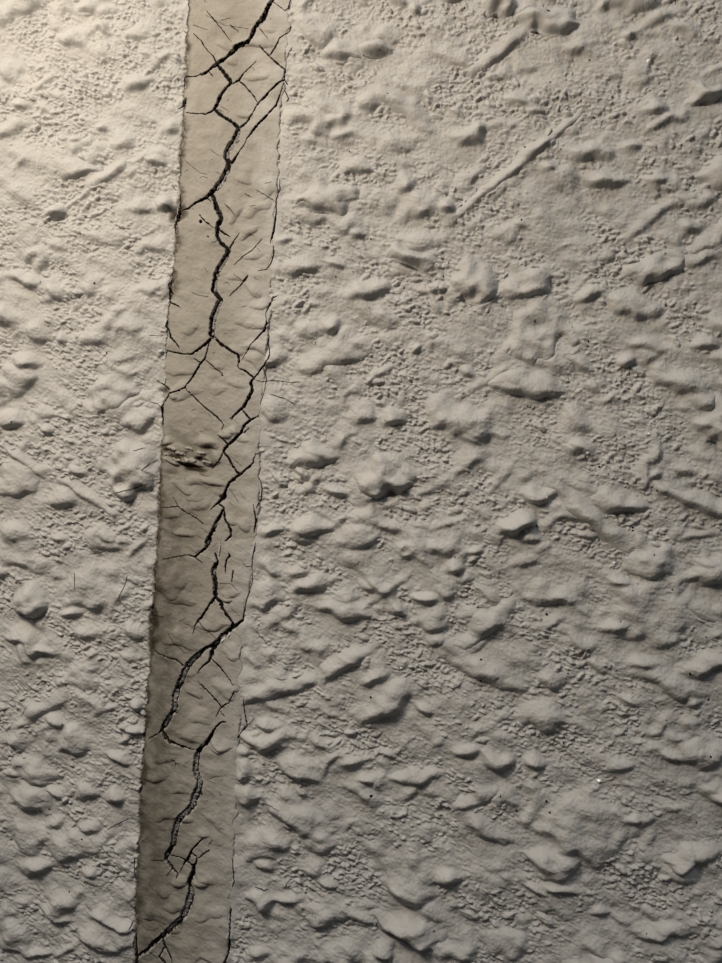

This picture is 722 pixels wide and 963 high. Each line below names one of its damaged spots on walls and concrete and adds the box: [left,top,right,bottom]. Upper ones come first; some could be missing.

crack [129,0,298,963]